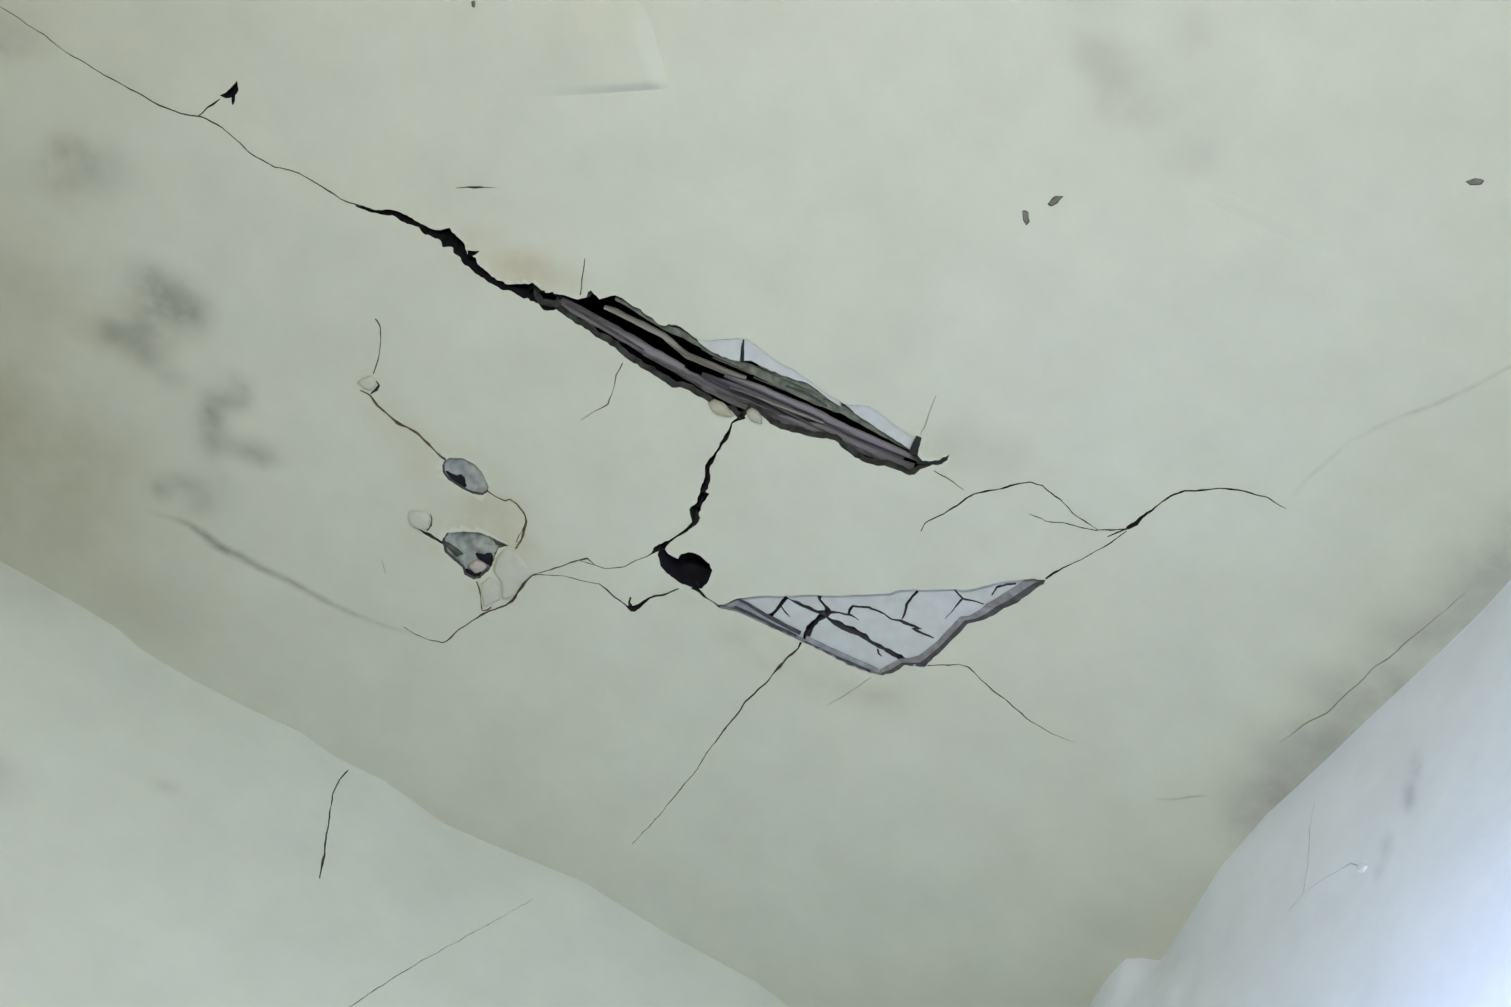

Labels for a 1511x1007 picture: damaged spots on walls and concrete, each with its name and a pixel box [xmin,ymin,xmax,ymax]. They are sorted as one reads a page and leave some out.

crack [0,6,585,311]
crack [360,319,446,460]
crack [581,363,623,420]
spalling [442,458,489,495]
spalling [442,531,533,600]
crack [404,410,746,643]
crack [921,471,1285,579]
spalling [879,579,1045,675]
crack [632,642,802,844]
crack [927,664,1072,742]
crack [319,771,347,878]